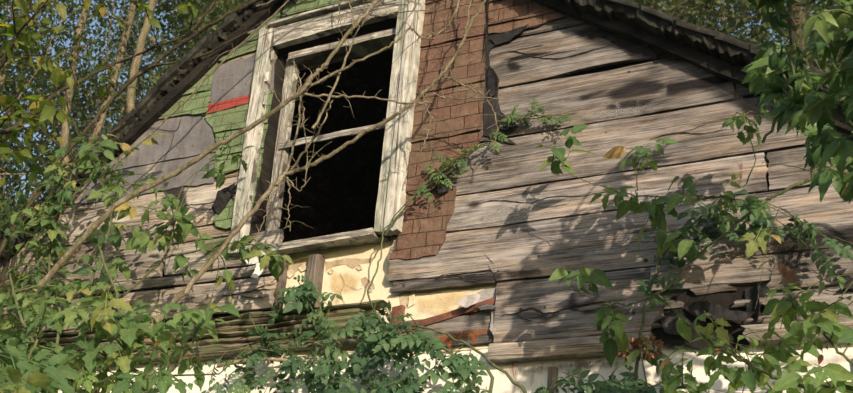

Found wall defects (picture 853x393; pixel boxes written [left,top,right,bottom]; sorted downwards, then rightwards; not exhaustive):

peeling [240,182,255,238]
flaking render [287,258,309,278]
flaking render [325,257,375,292]
flaking render [400,291,415,309]
peeling [457,288,497,335]
corrosion [430,330,487,348]